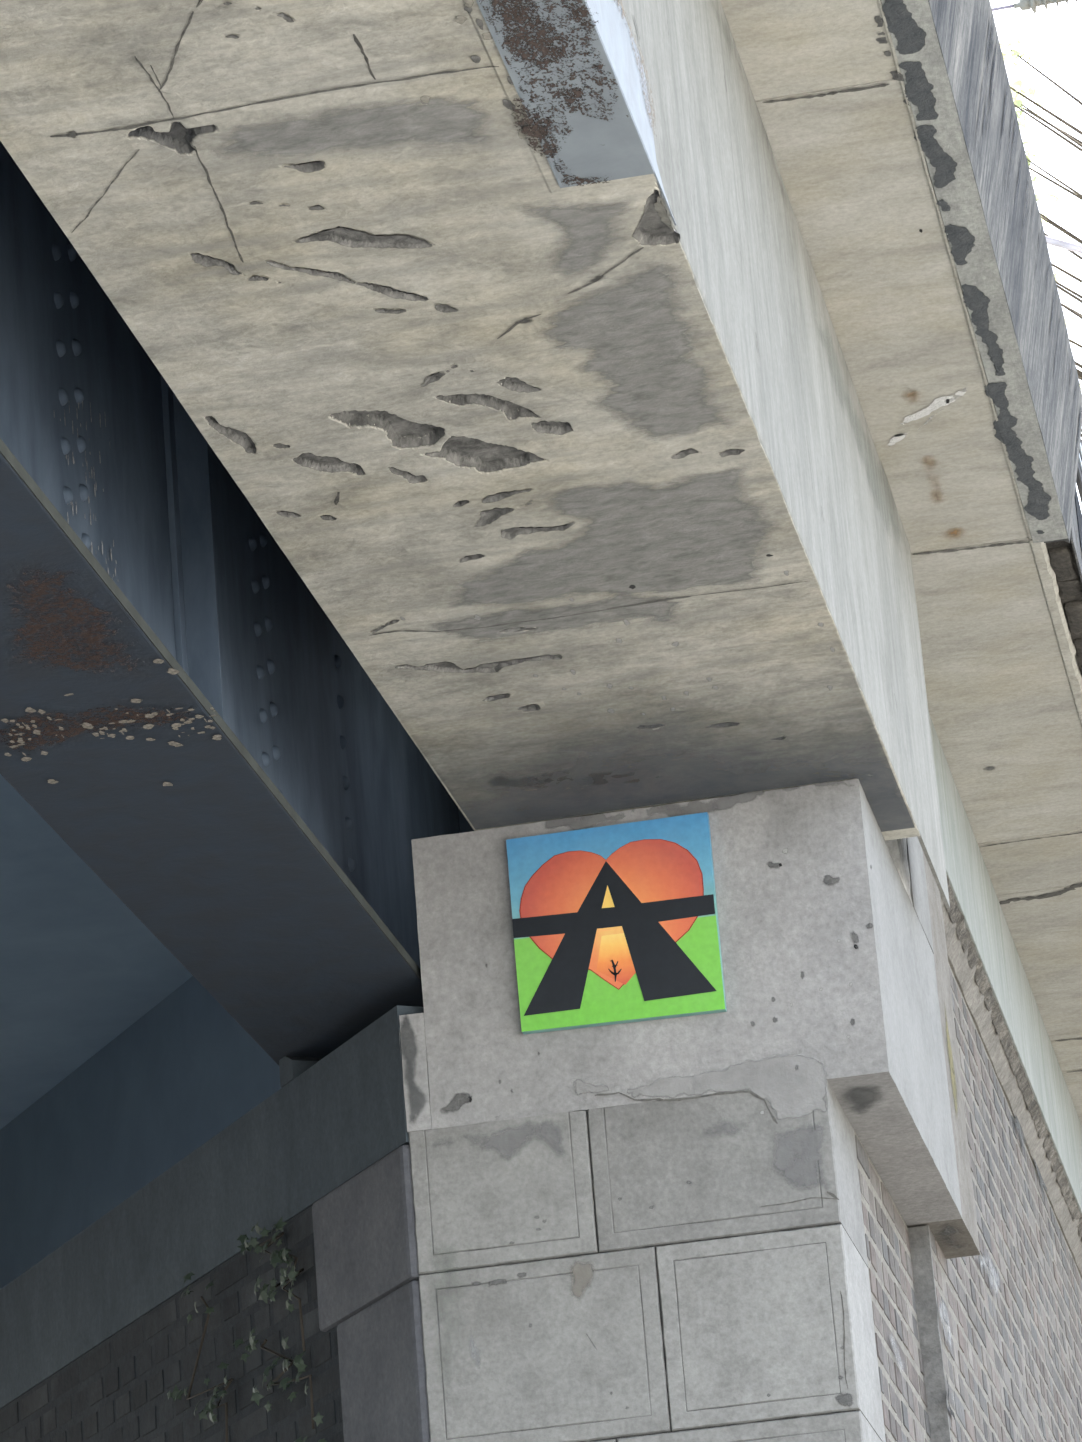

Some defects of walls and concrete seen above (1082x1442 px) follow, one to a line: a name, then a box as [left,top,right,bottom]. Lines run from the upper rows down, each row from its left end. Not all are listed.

corrosion [479,0,628,186]
crack [50,0,499,263]
spalling [296,226,432,249]
spalling [632,190,680,245]
spalling [191,253,458,314]
spalling [422,365,573,435]
spalling [330,410,544,472]
spalling [453,489,575,539]
crack [999,883,1082,905]
water stain [400,1017,425,1121]
crack [595,1090,778,1124]
water stain [475,1123,561,1157]